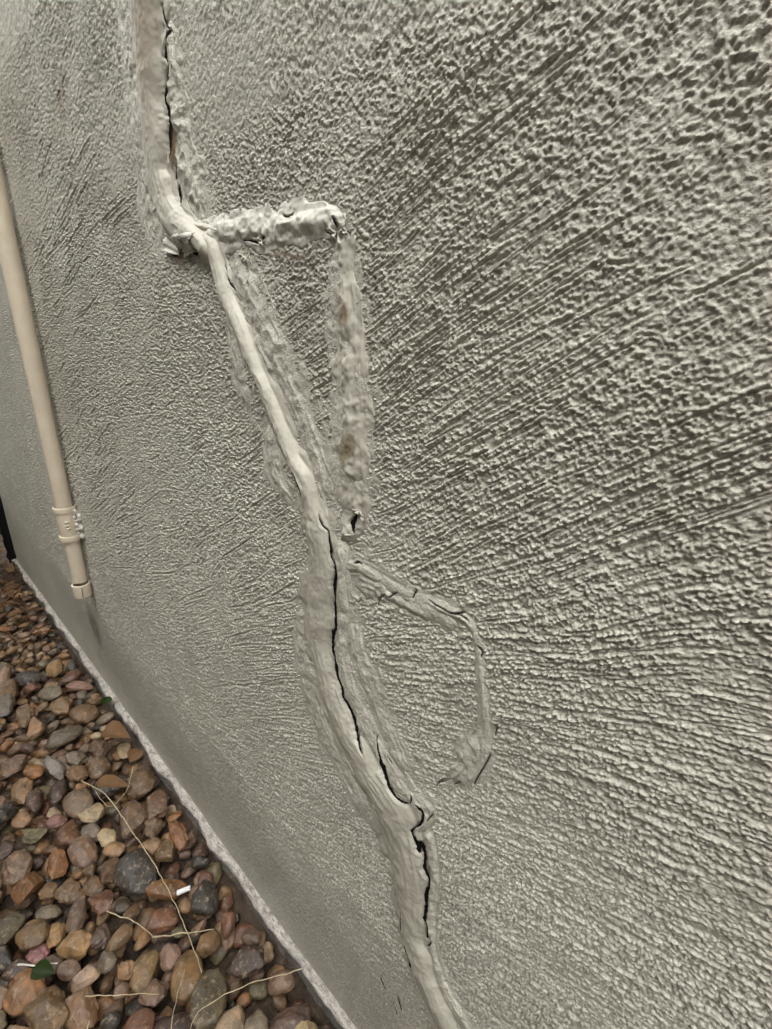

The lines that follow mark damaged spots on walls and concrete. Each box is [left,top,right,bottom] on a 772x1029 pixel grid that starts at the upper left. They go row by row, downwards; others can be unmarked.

crack [163,10,182,203]
crack [378,592,467,620]
crack [319,518,433,967]